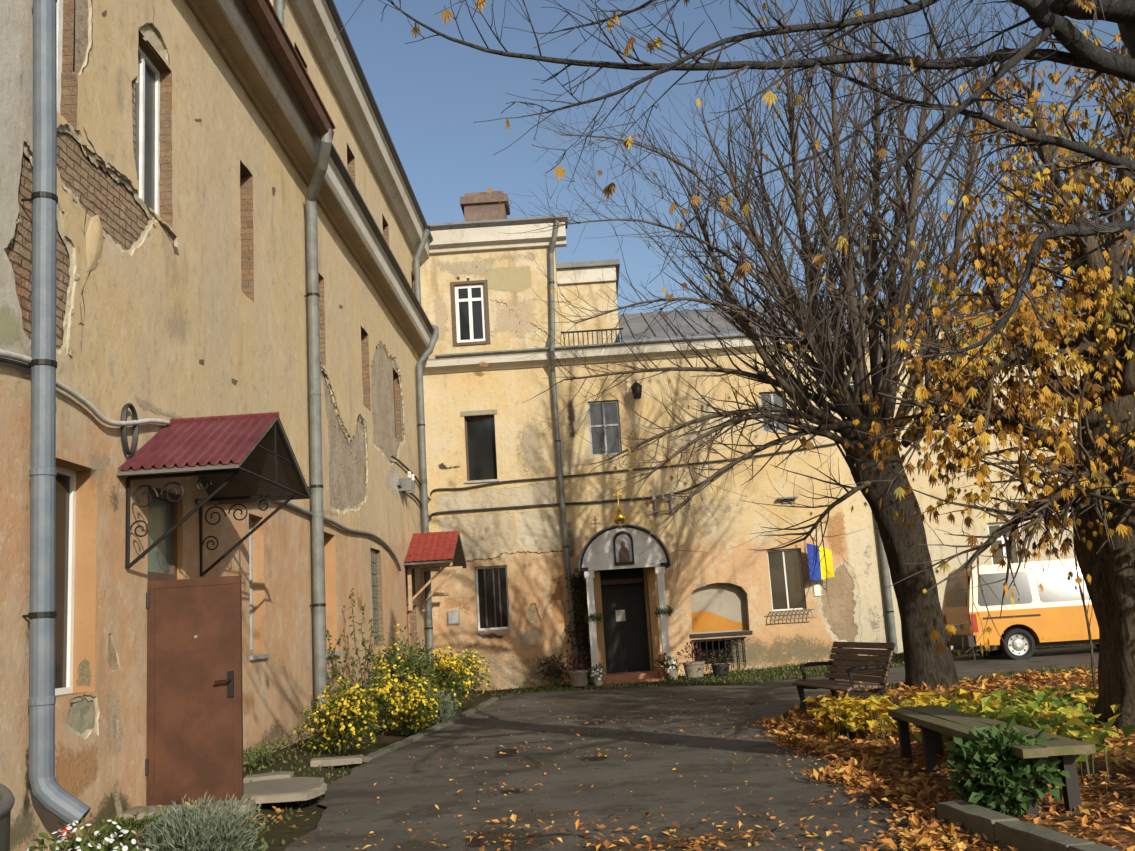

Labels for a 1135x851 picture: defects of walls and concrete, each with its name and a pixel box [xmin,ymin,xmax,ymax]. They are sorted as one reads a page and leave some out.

spalling [75,0,107,73]
spalling [4,139,33,346]
spalling [56,206,80,356]
spalling [57,124,179,255]
spalling [320,342,404,513]
spalling [816,558,862,649]
peeling [55,659,117,795]